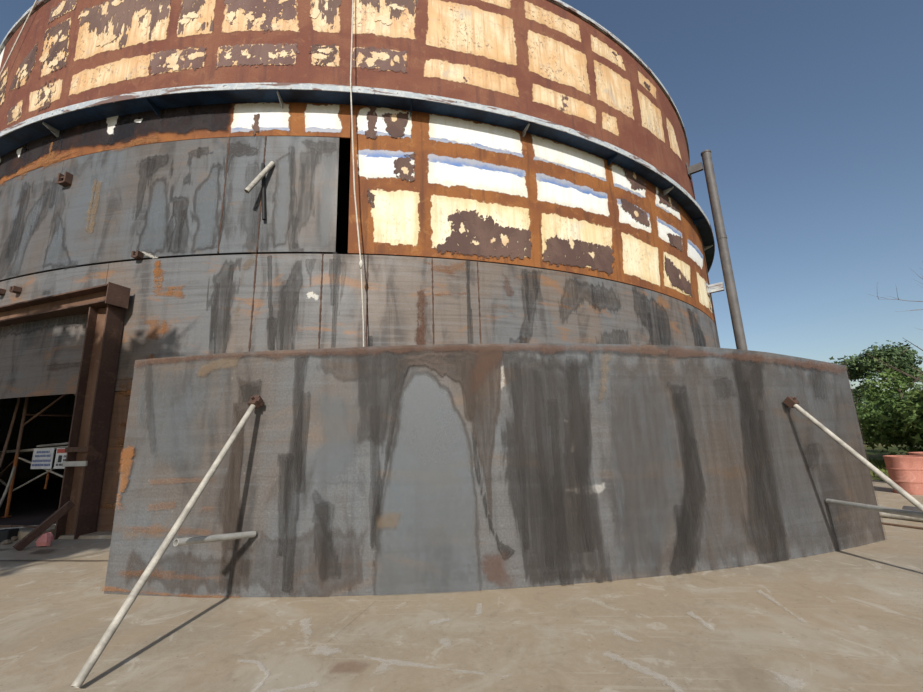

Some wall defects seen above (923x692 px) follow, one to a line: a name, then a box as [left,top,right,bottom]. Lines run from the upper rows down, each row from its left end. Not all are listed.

peeling [0,0,214,125]
peeling [215,0,341,69]
peeling [365,106,409,139]
corrosion [153,261,183,298]
leakage [138,141,258,254]
peeling [434,209,532,261]
peeling [542,235,615,276]
peeling [621,197,650,227]
peeling [665,233,693,297]
leakage [267,255,309,592]
leakage [362,261,606,586]
corrosion [117,440,134,504]